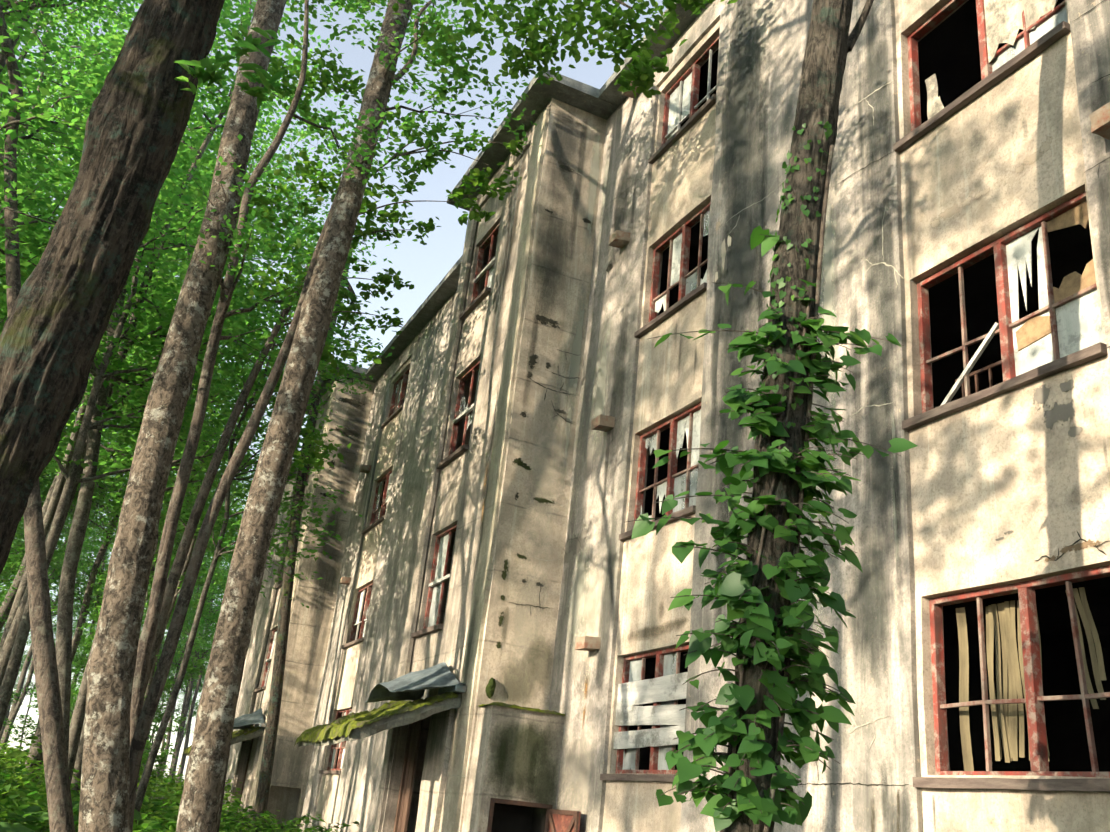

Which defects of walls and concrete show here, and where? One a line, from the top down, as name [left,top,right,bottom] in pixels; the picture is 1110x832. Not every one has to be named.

damp [866,29,890,176]
damp [552,115,599,234]
damp [543,218,564,300]
damp [565,304,584,456]
damp [851,197,899,561]
peeling [1033,380,1083,437]
damp [854,542,897,660]
crack [1035,532,1108,561]
damp [892,793,908,832]